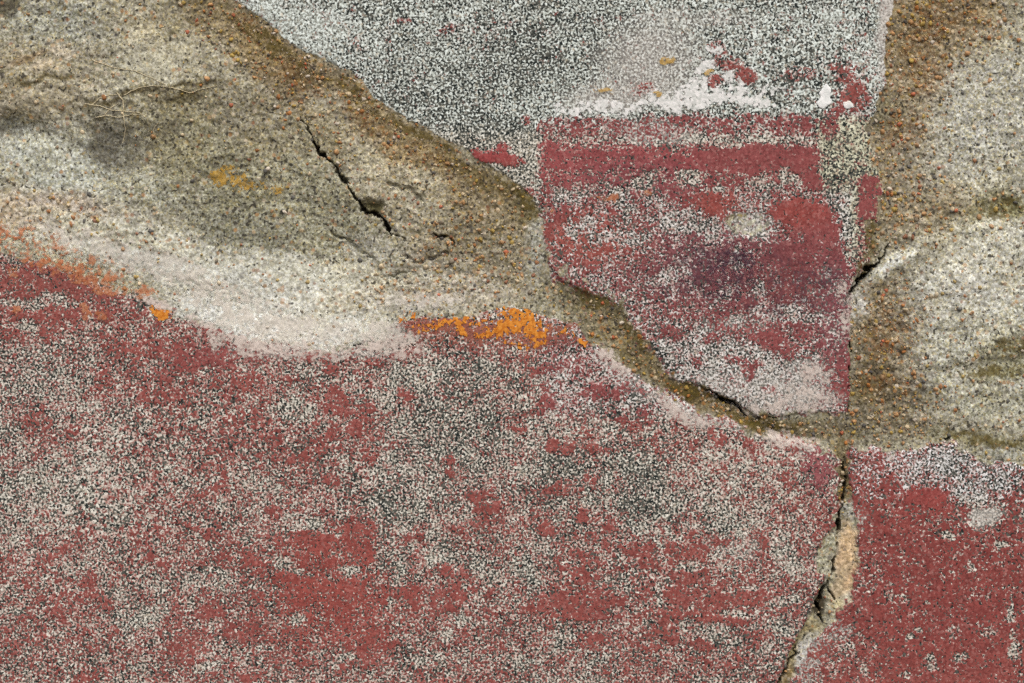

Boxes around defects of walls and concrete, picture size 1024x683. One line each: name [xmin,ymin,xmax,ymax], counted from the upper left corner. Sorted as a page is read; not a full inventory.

crack [301,121,455,278]
crack [845,244,889,302]
crack [701,387,777,419]
crack [777,457,848,683]